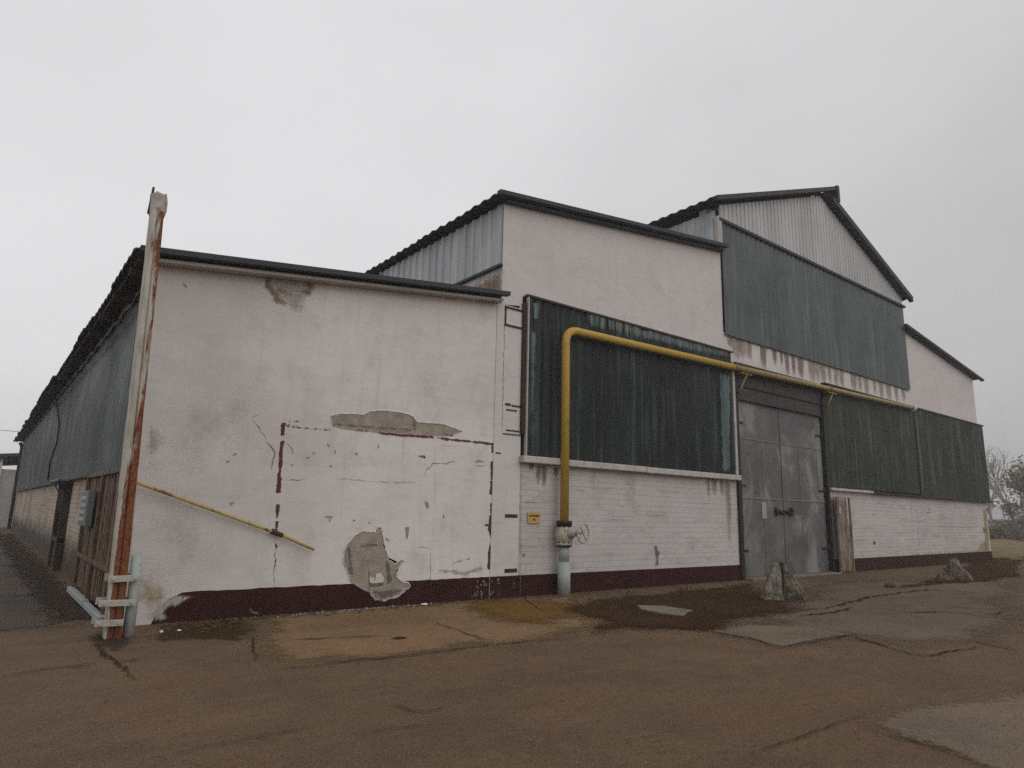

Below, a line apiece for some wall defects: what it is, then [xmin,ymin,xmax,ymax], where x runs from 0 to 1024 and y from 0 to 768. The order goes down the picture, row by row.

crack [253,415,303,481]
spalling [330,410,462,449]
spalling [342,519,411,602]